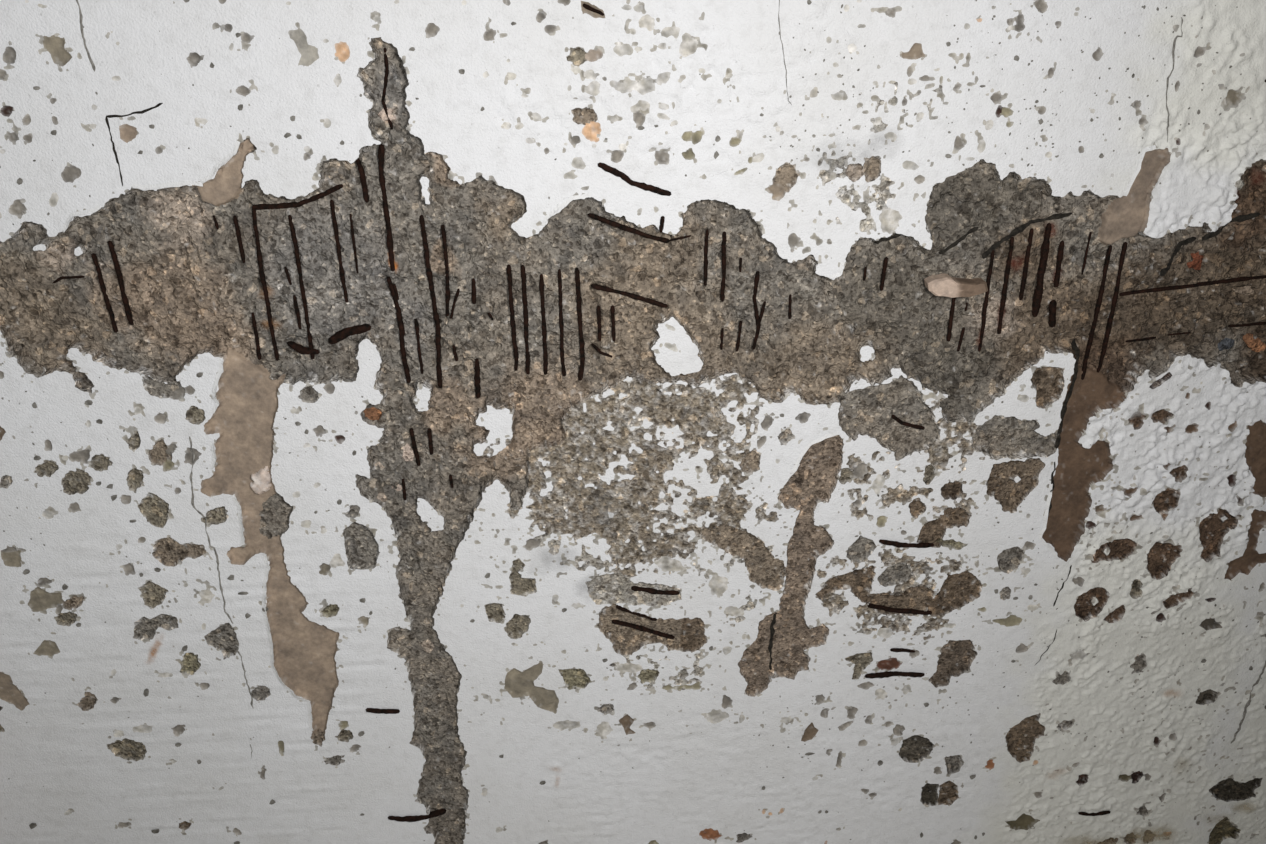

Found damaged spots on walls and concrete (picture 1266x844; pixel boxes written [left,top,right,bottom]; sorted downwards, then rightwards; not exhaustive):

crack [76,0,95,72]
corrosion [582,121,601,142]
spalling [598,150,671,196]
peeling [818,150,896,235]
spalling [35,439,113,513]
spalling [120,468,207,567]
spalling [343,505,380,570]
spalling [1072,538,1182,623]
spalling [504,661,591,714]
spalling [845,640,977,690]
spalling [838,707,964,806]
spalling [1005,714,1073,763]